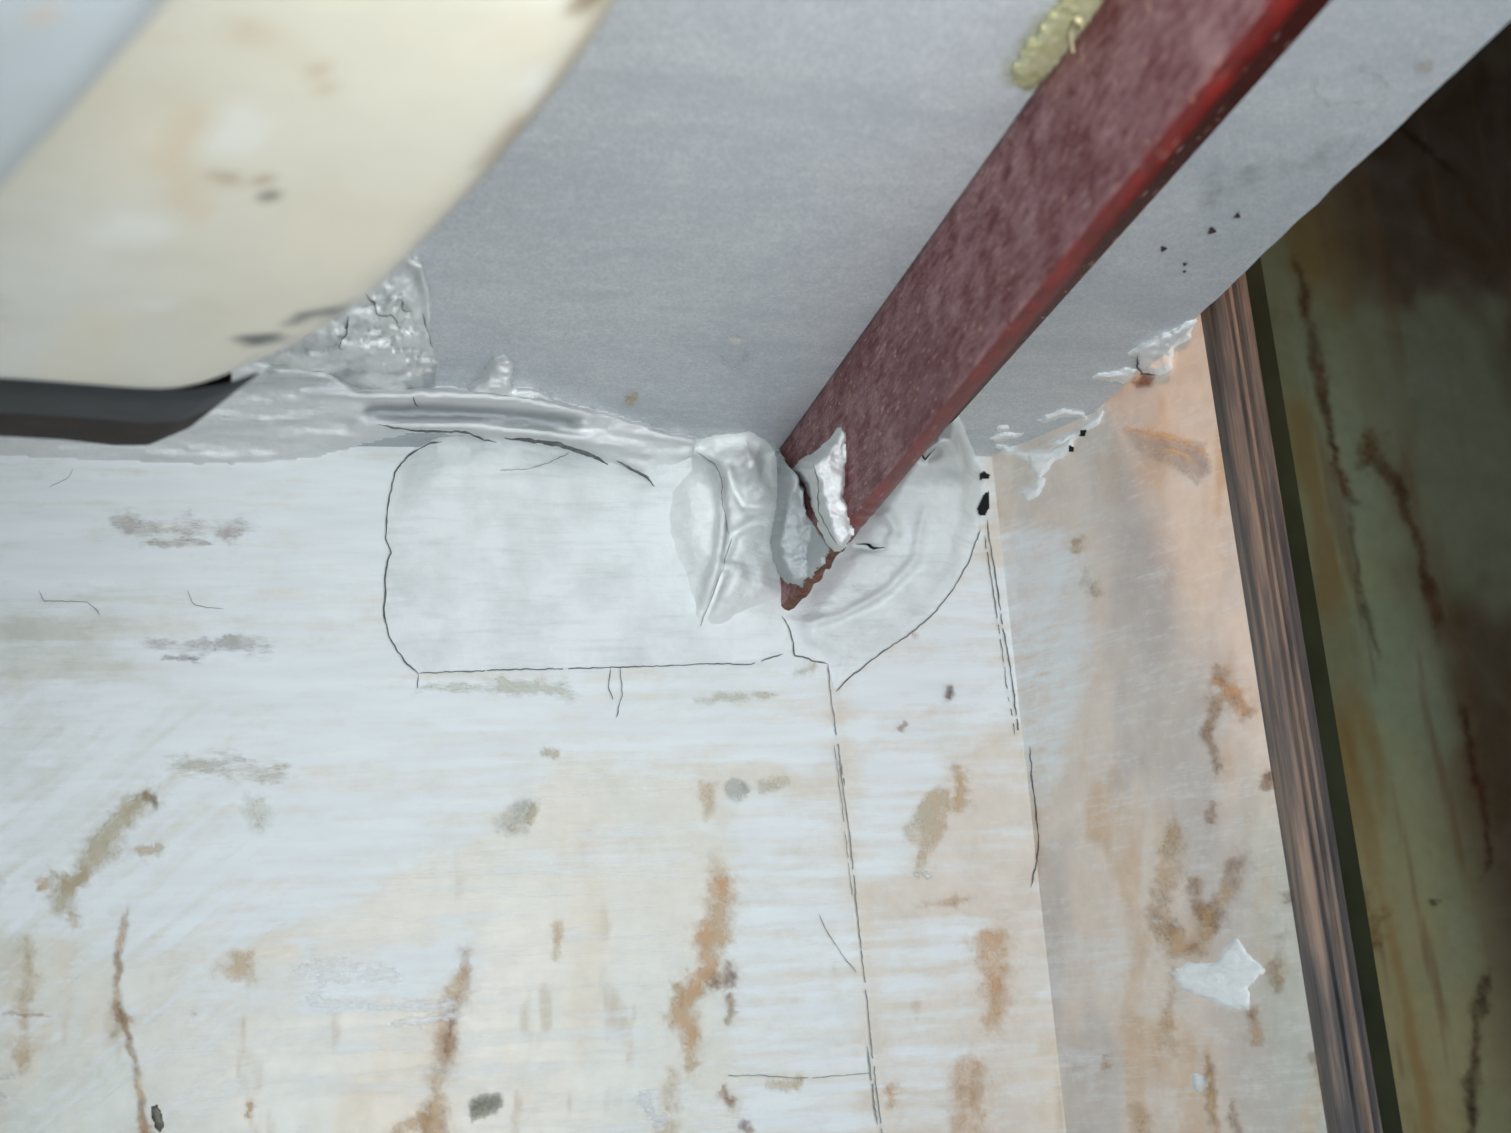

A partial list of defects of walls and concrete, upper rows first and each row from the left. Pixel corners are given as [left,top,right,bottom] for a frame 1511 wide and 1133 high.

crack [339,295,433,350]
flaking render [1092,318,1198,386]
flaking render [990,403,1105,501]
crack [379,397,1039,1133]
rust [39,793,157,910]
rust [439,969,467,1060]
rust [673,877,735,1049]
rust [1156,888,1229,952]
flaking render [1165,938,1265,1010]
flaking render [1191,1073,1210,1092]